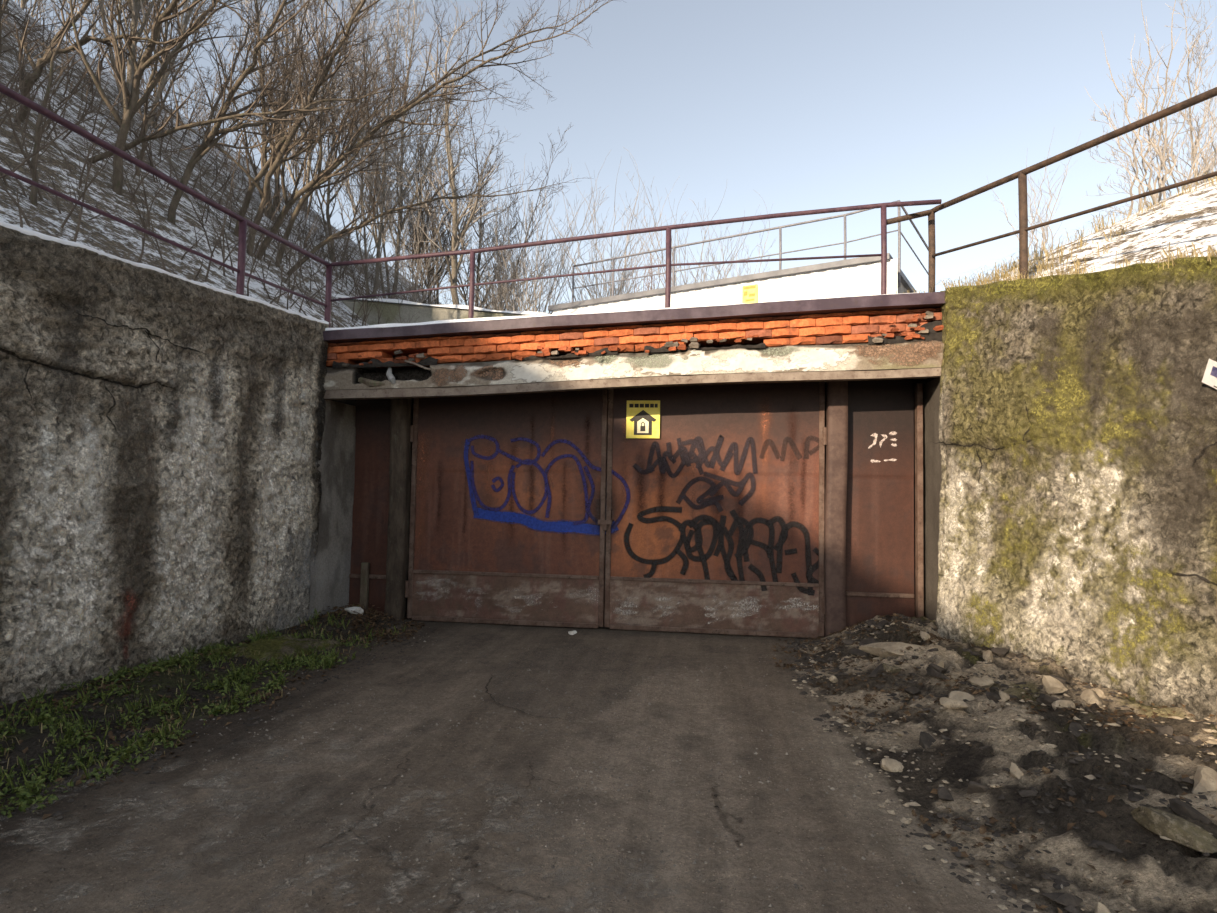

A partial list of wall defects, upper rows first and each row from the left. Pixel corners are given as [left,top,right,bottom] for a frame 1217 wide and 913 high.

crack [0,300,209,433]
spalling [332,350,438,387]
peeling [511,335,852,383]
damp [1,333,227,664]
damp [939,473,988,601]
damp [1029,556,1059,627]
damp [1070,449,1122,547]
damp [1081,310,1217,556]
crack [1163,572,1217,585]
crack [1192,442,1217,466]